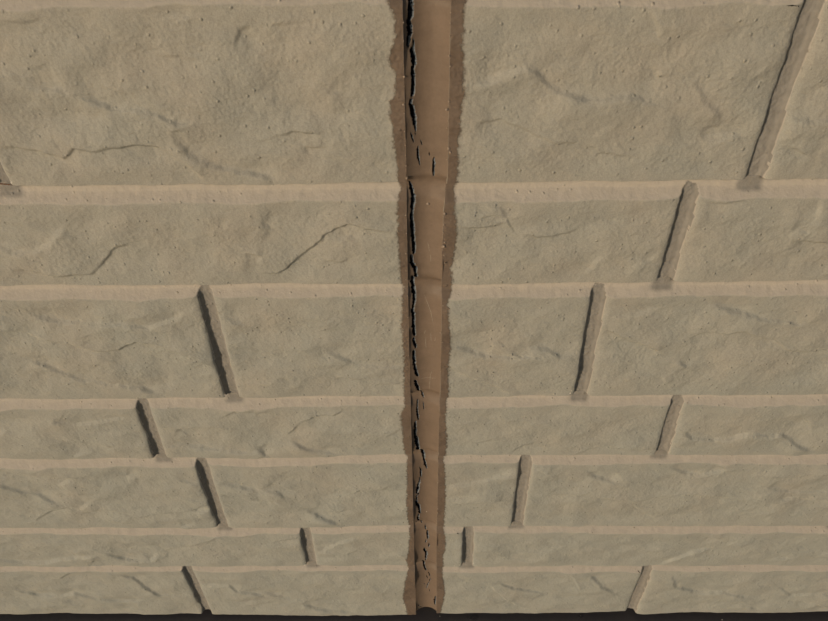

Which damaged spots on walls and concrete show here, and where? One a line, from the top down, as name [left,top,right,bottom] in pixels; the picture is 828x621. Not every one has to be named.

crack [406,0,436,609]